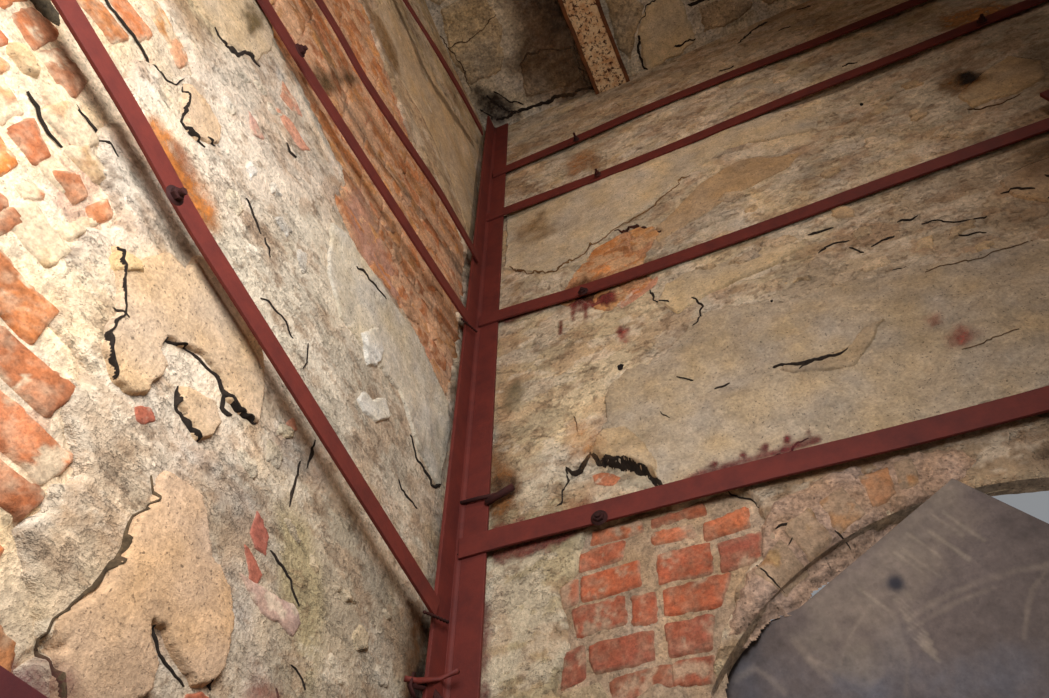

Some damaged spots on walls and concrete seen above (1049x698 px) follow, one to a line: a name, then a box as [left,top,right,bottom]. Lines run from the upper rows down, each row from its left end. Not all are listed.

crack [105,0,216,148]
crack [214,27,260,67]
crack [26,91,63,148]
crack [76,104,119,157]
crack [808,215,1033,272]
crack [104,247,130,380]
flaking render [504,107,1049,486]
crack [174,386,203,442]
crack [165,340,257,425]
crack [772,348,848,369]
crack [557,416,663,506]
crack [34,475,162,698]